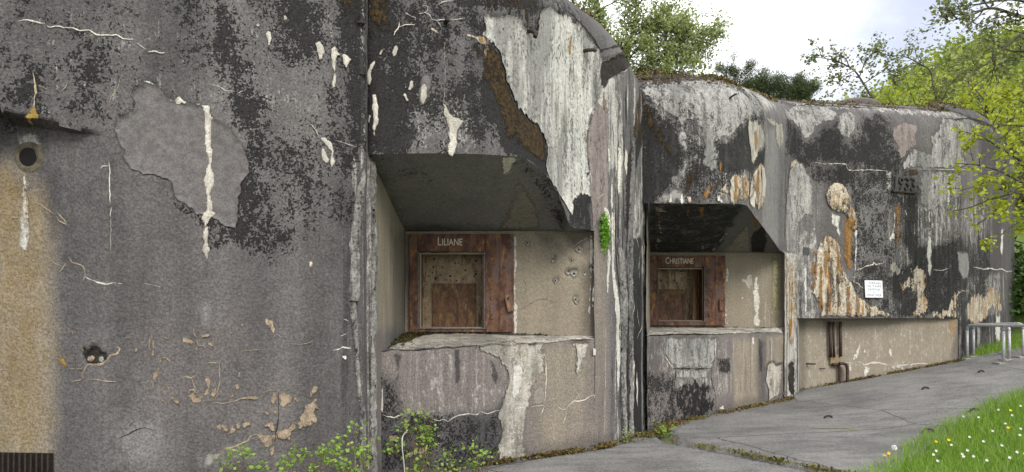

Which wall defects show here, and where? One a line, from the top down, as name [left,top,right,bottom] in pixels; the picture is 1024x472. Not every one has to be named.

crack [20,19,165,53]
peeling [114,81,249,228]
spalling [483,6,628,228]
spalling [641,83,856,188]
spalling [68,328,107,364]
peeling [125,336,217,404]
peeling [183,328,213,350]
peeling [216,422,250,435]
peeling [230,372,319,457]
crack [434,410,500,422]
spalling [399,333,594,462]
damp [669,379,714,419]